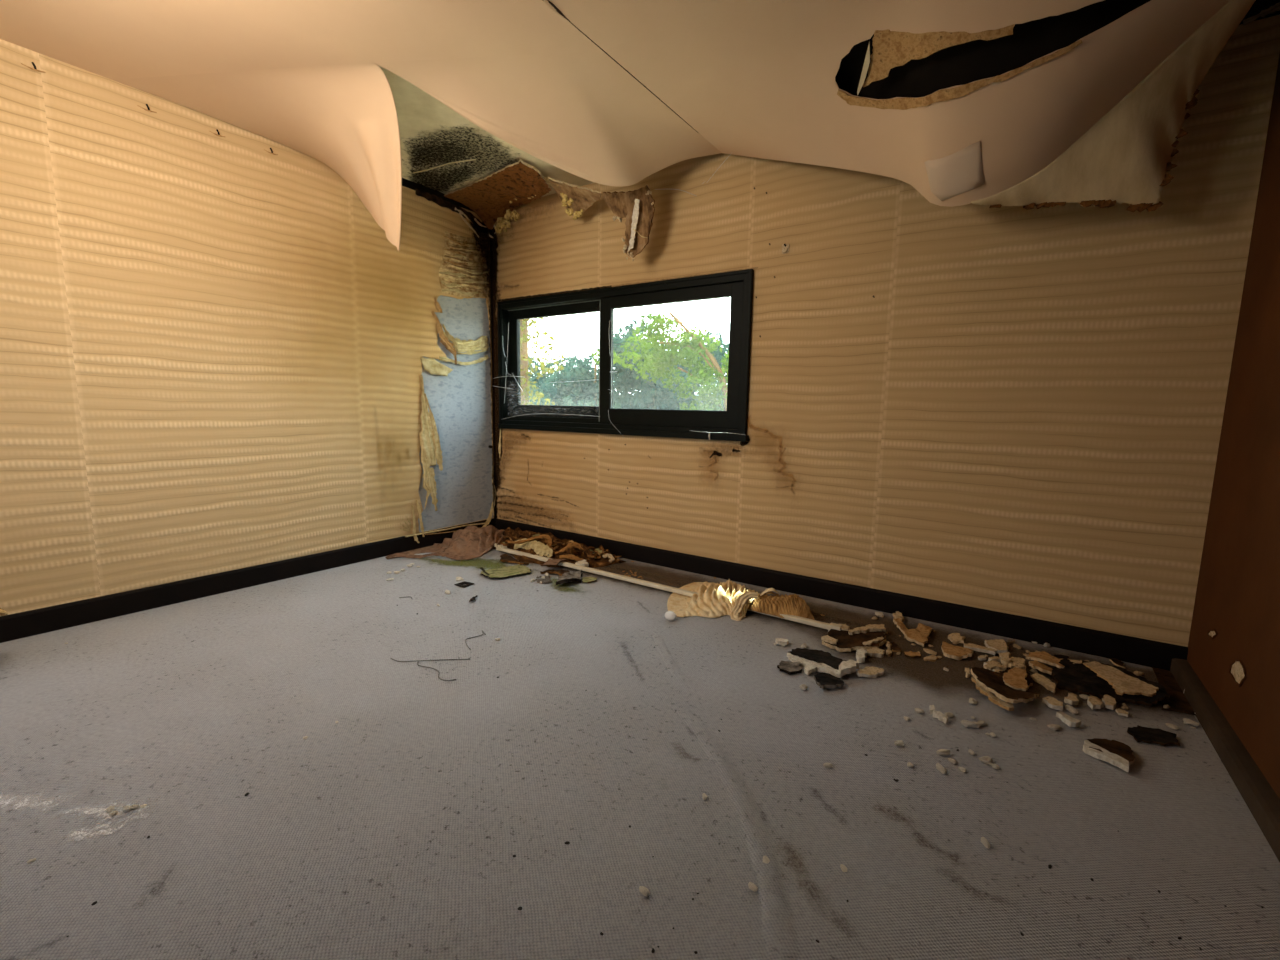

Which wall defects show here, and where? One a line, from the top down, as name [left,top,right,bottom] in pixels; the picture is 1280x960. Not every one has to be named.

peeling [400,295,496,543]